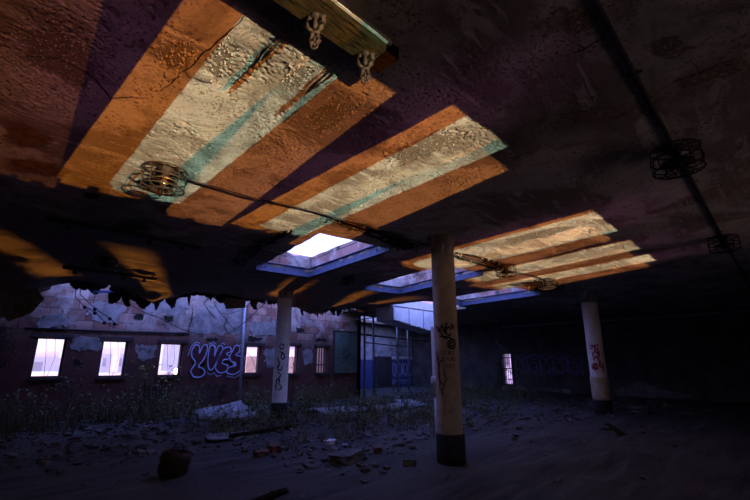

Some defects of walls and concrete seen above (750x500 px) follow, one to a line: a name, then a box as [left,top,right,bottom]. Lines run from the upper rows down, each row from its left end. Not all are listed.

crack [26,40,140,109]
crack [160,12,249,92]
peeling [36,309,72,332]
peeling [86,299,276,369]